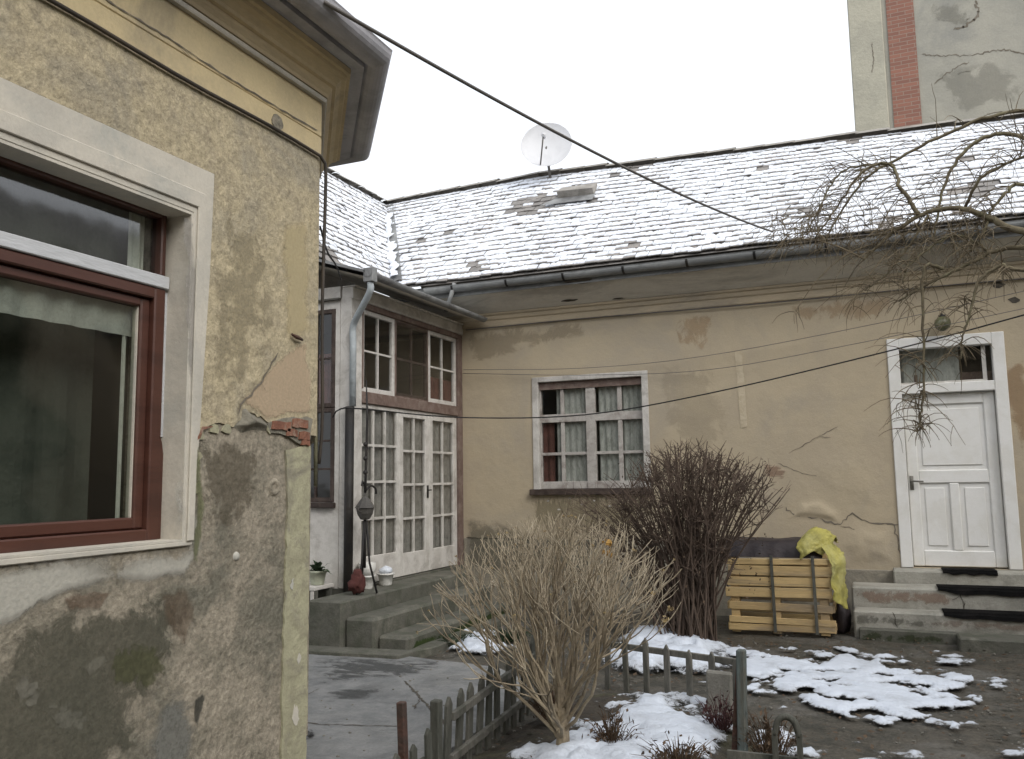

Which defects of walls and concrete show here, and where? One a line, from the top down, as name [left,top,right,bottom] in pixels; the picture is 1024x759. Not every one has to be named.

crack [924,0,1024,84]
crack [239,353,278,412]
crack [778,428,834,476]
crack [786,507,900,552]
leakage [0,596,176,759]
leakage [152,695,204,759]